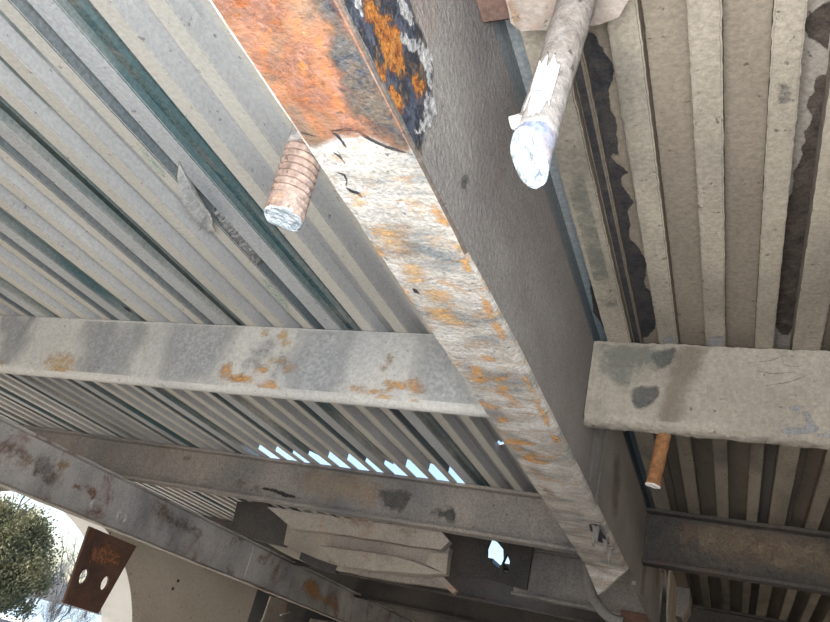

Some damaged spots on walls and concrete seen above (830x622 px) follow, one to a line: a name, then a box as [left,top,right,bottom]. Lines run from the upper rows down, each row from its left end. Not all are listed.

corrosion [212,0,427,150]
crack [333,150,362,197]
corrosion [481,296,503,338]
corrosion [220,365,250,382]
corrosion [370,380,424,399]
corrosion [469,366,517,407]
damp [633,387,658,408]
damp [653,348,699,422]
damp [381,490,410,511]
damp [438,509,455,521]